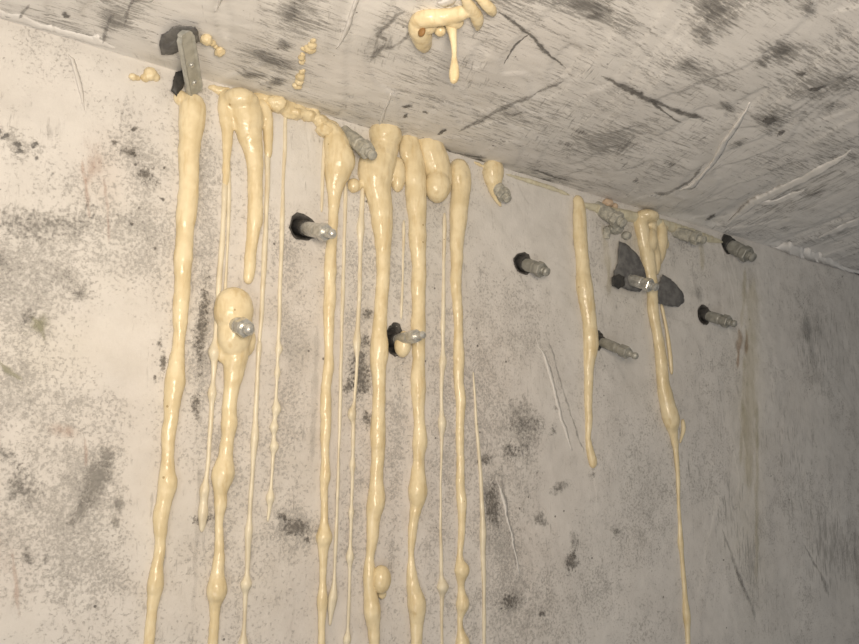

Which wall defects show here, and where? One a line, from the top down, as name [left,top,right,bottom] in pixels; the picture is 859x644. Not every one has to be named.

crack [499,12,562,65]
crack [602,76,703,122]